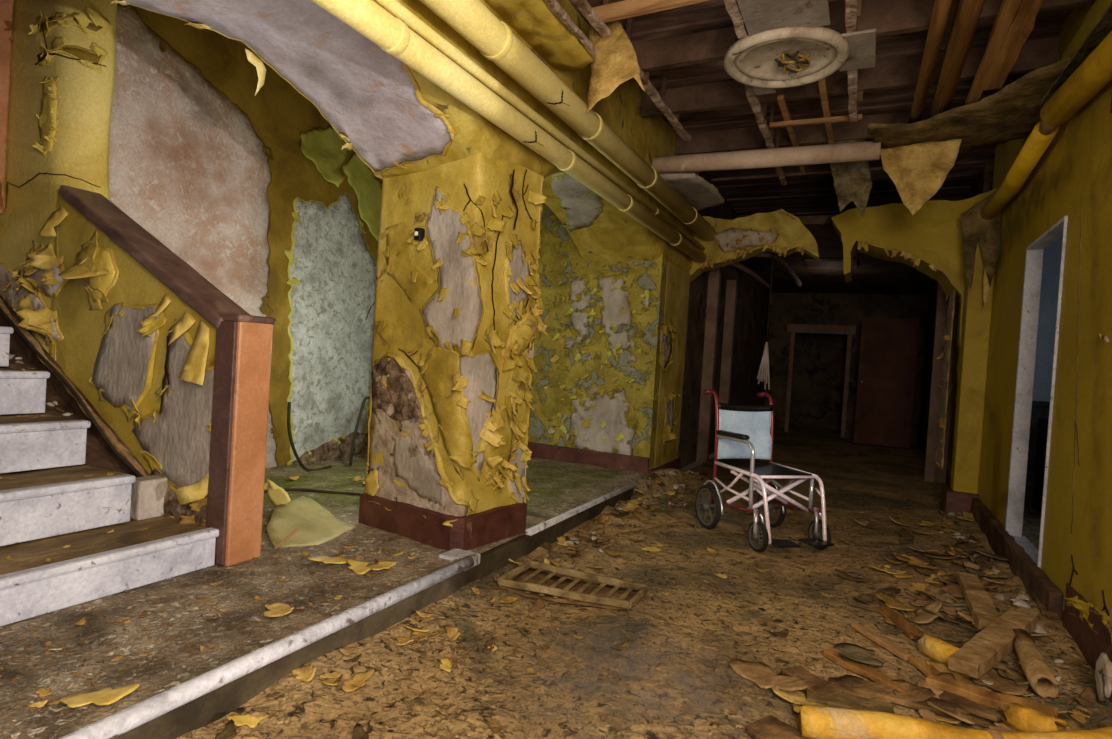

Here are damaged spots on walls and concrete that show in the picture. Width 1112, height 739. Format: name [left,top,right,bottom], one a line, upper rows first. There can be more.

flaking render [0,0,678,527]
crack [463,131,540,330]
flaking render [700,226,804,269]
spalling [884,247,937,271]
crack [1101,590,1110,617]